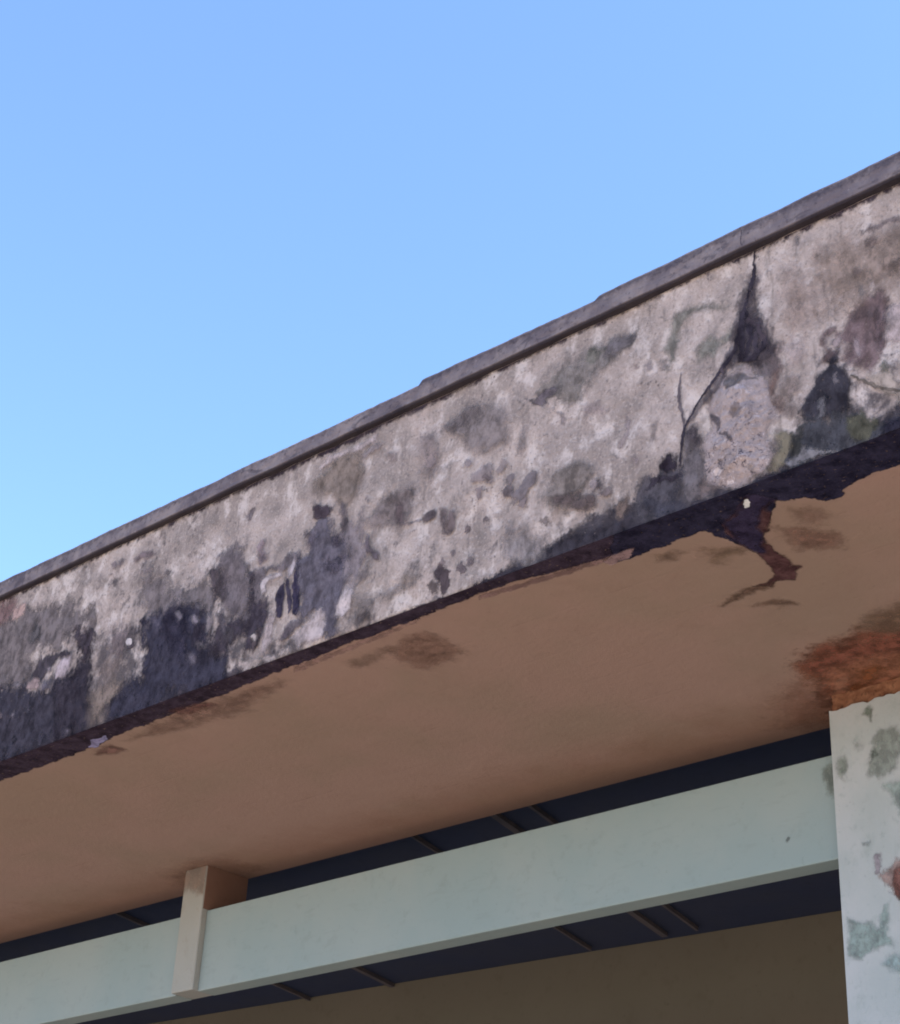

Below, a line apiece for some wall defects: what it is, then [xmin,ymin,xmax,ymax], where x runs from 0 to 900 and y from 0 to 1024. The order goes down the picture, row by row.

water stain [724,184,900,265]
water stain [785,217,900,321]
crack [677,227,769,466]
water stain [0,273,900,781]
rust [795,605,900,718]